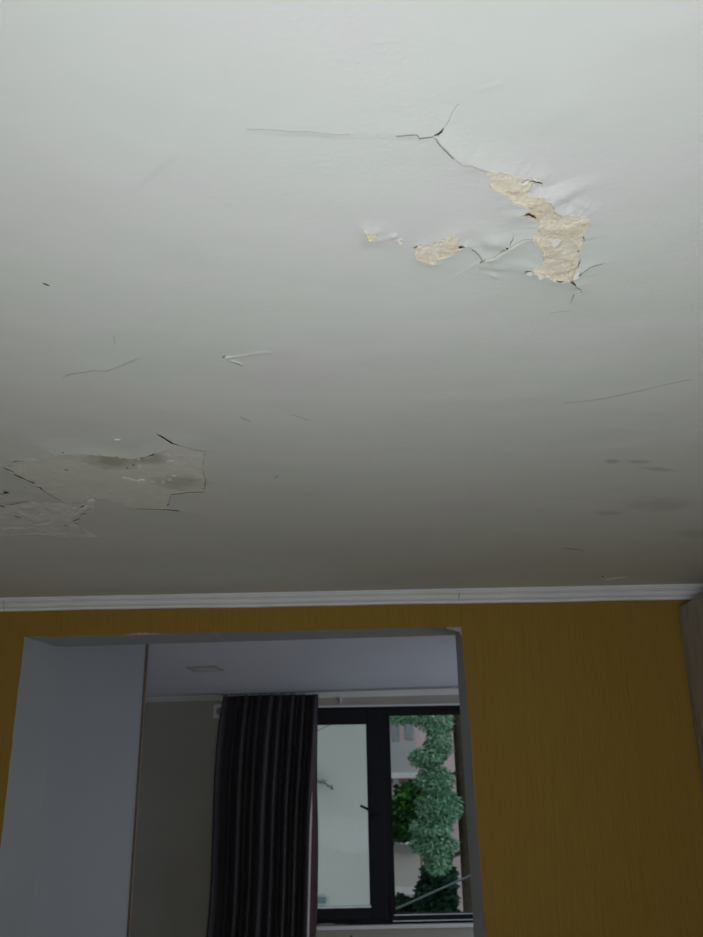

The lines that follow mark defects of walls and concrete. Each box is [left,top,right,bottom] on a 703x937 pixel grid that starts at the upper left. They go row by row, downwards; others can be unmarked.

crack [433,106,457,159]
peeling [402,101,632,330]